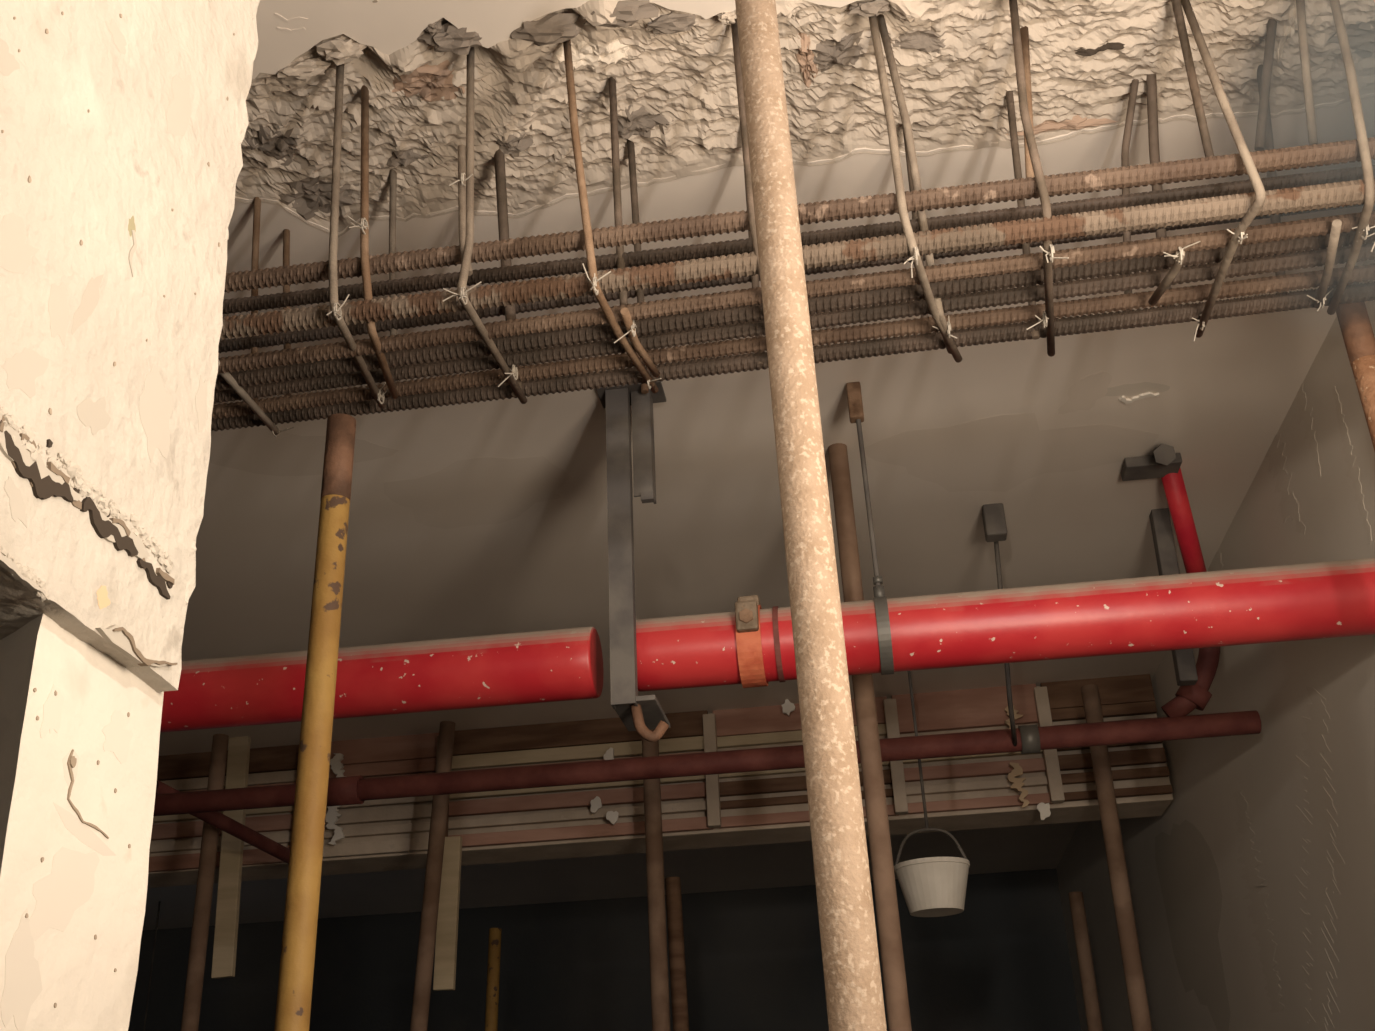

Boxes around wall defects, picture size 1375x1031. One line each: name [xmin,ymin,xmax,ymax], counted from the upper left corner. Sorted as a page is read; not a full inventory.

spalling [392,60,465,102]
spalling [553,39,630,71]
spalling [795,30,865,88]
spalling [892,31,947,54]
spalling [245,126,359,220]
spalling [494,133,535,157]
spalling [618,105,674,139]
spalling [798,137,1375,364]
spalling [211,210,769,432]
flaking render [0,404,174,589]
spalling [0,546,50,603]
crack [67,749,109,839]